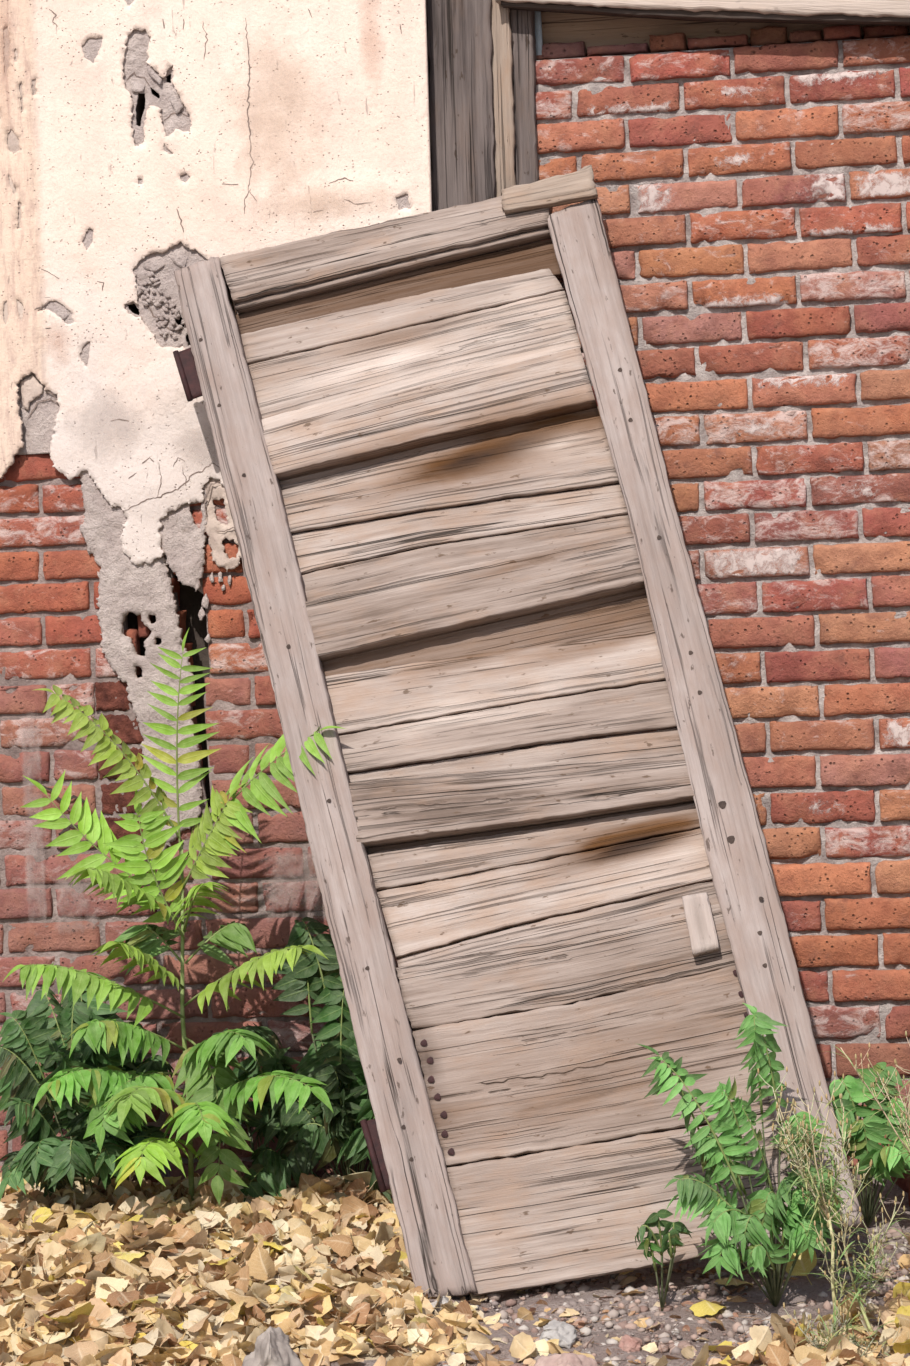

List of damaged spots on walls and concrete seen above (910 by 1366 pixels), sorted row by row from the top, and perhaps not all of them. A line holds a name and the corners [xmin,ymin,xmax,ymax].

flaking render [123,30,191,154]
crack [228,18,257,214]
flaking render [125,242,207,349]
flaking render [17,373,60,455]
flaking render [79,471,241,861]